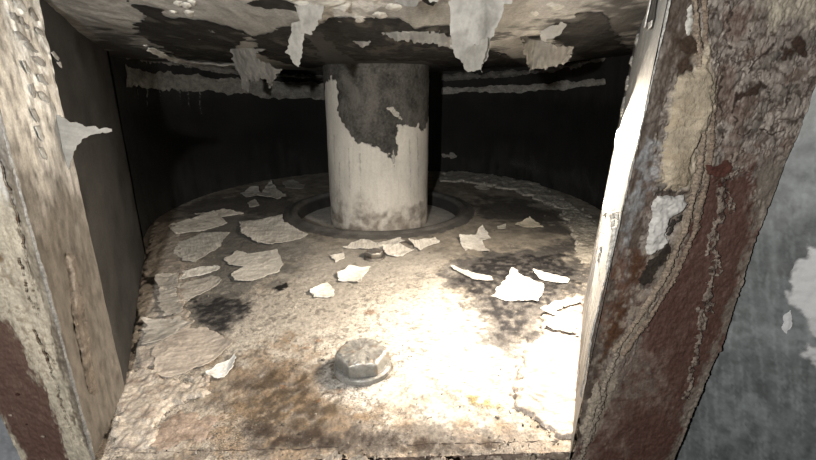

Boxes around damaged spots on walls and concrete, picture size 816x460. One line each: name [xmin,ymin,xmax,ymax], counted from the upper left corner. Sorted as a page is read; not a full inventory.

peeling [9,0,51,103]
peeling [125,0,657,167]
peeling [29,108,48,160]
peeling [56,115,112,170]
peeling [310,237,440,298]
peeling [439,171,619,270]
peeling [533,269,570,283]
spalling [638,195,687,285]
peeling [110,179,308,453]
corrosion [598,301,626,363]
water stain [247,424,341,447]
water stain [390,436,446,450]